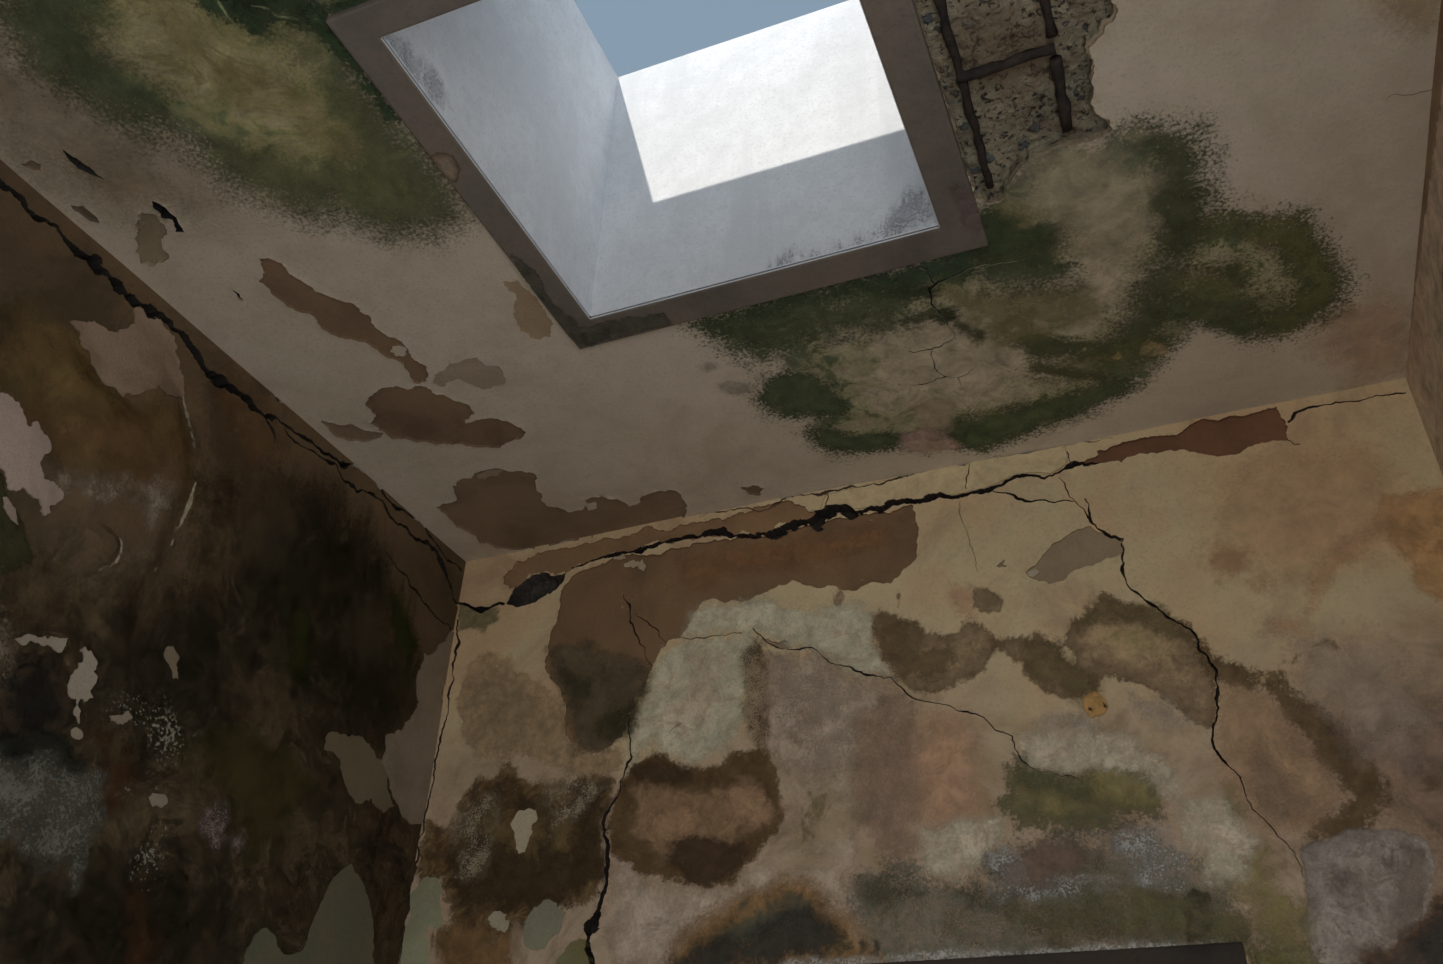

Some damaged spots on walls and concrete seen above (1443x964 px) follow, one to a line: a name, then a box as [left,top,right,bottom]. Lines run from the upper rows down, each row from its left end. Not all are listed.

water stain [0,0,465,245]
spalling [914,0,1118,204]
crack [0,178,505,870]
peeling [259,258,525,448]
water stain [511,256,671,346]
peeling [436,468,919,754]
water stain [0,303,1443,964]
crack [565,438,1303,877]
water stain [688,115,1357,457]
peeling [1084,407,1288,467]
crack [1288,392,1406,445]
crack [583,713,633,964]